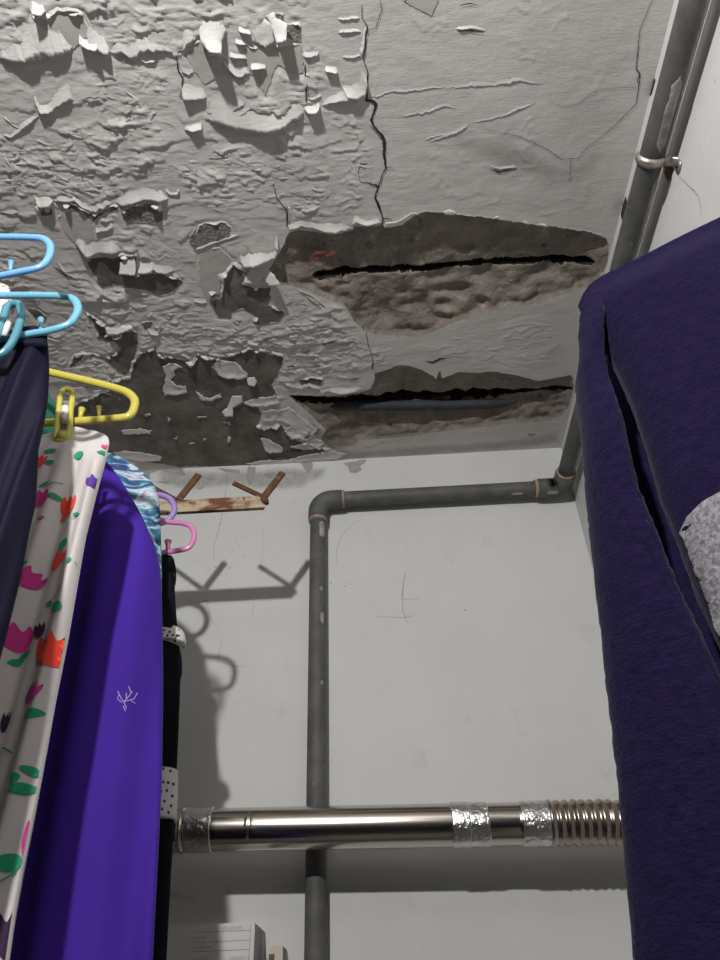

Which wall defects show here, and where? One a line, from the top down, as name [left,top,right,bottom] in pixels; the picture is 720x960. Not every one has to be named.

peeling [0,0,368,139]
crack [358,0,392,225]
peeling [26,307,47,322]
peeling [0,187,184,309]
spalling [179,210,609,337]
peeling [60,311,574,490]